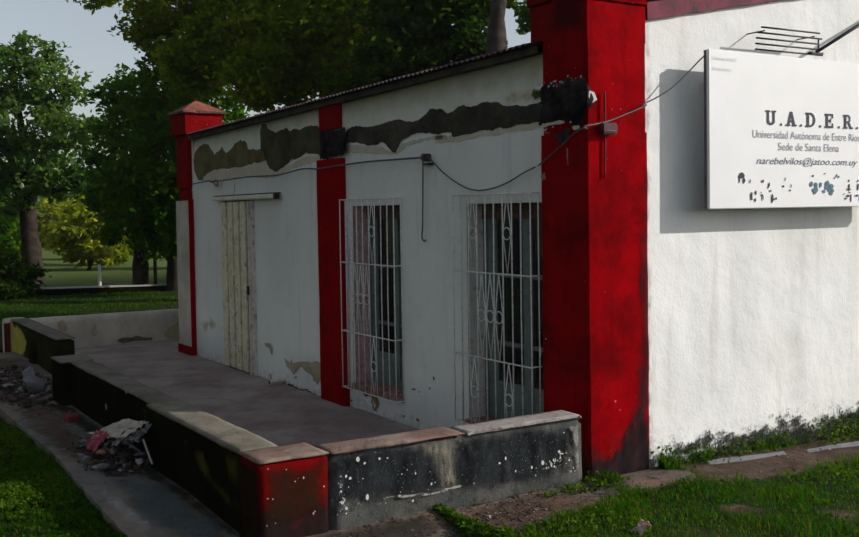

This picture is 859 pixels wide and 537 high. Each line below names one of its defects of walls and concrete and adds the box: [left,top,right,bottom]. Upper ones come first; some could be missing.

flaking render [193,75,597,181]
flaking render [284,358,321,385]
water stain [331,428,574,514]
water stain [594,427,648,479]